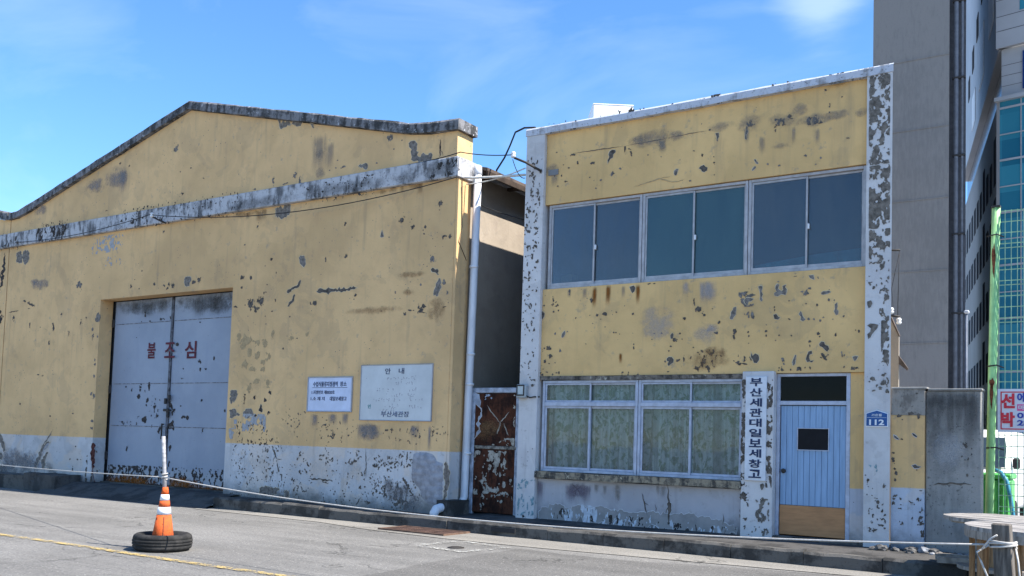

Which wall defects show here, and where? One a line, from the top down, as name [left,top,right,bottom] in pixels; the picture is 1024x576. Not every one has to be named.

peeling [36,219,68,242]
peeling [92,192,240,266]
spalling [275,204,291,220]
spalling [272,160,377,202]
peeling [519,146,632,387]
peeling [807,64,890,393]
peeling [69,330,446,512]
spalling [473,274,859,536]